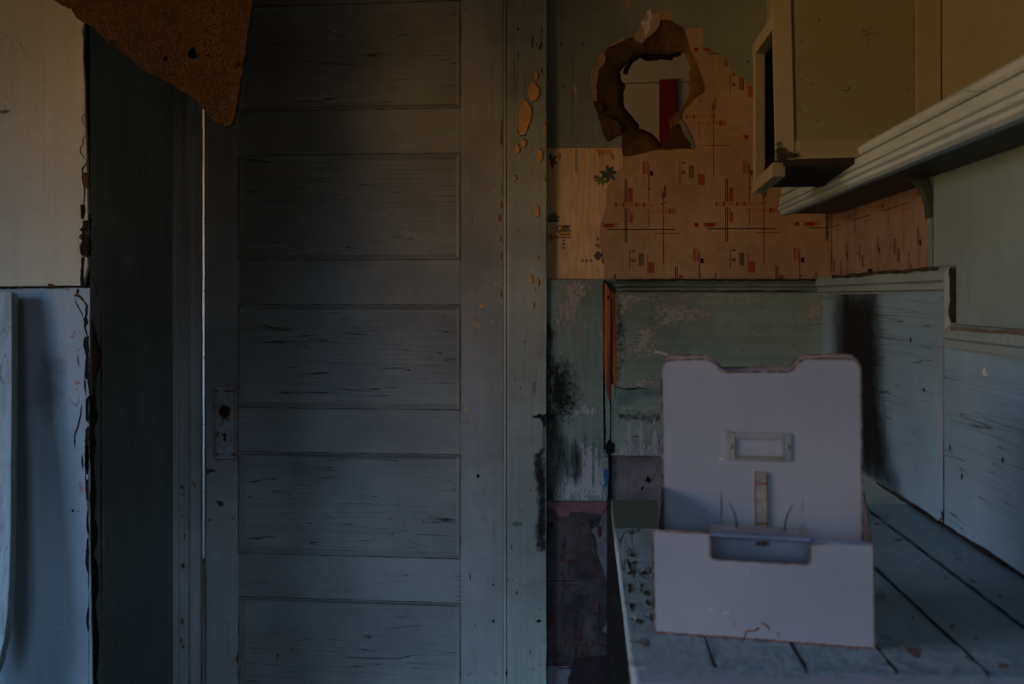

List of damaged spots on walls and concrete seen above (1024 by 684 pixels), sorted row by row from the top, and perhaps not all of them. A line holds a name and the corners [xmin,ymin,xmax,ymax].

peeling [500,67,544,163]
spalling [590,9,704,157]
spalling [70,276,102,684]
leakage [547,324,600,500]